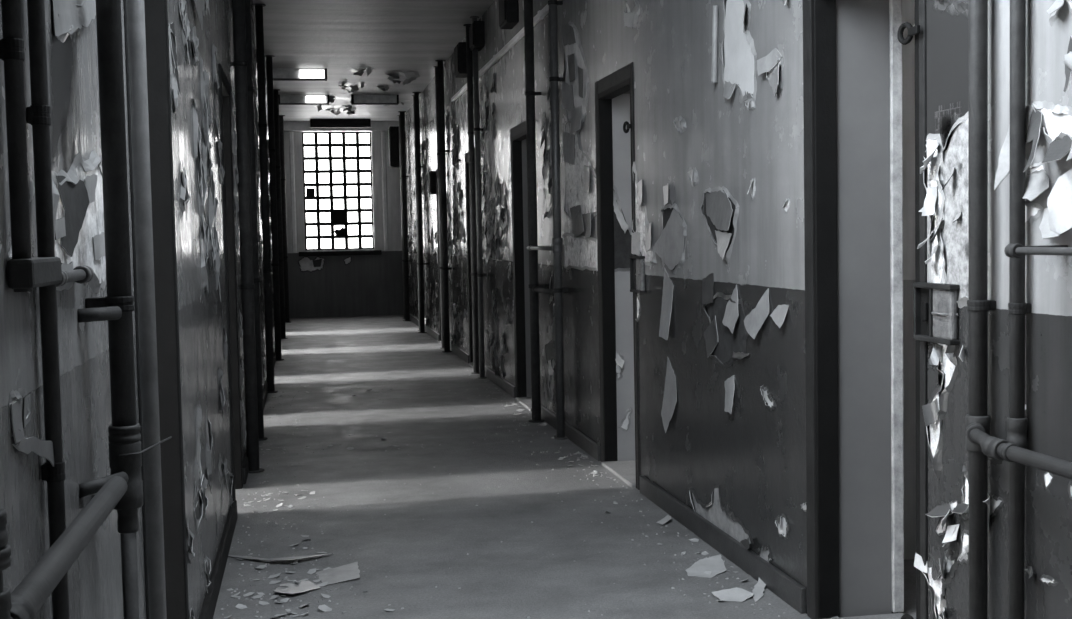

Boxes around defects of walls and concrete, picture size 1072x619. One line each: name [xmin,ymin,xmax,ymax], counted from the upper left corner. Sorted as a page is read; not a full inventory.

peeling [711,0,783,110]
peeling [1047,0,1072,27]
peeling [613,162,687,340]
peeling [688,167,756,263]
peeling [917,112,969,309]
peeling [994,124,1010,190]
peeling [1023,100,1072,239]
peeling [661,357,677,433]
peeling [702,273,789,414]
peeling [922,343,965,480]
peeling [914,466,969,619]
peeling [1044,472,1054,489]